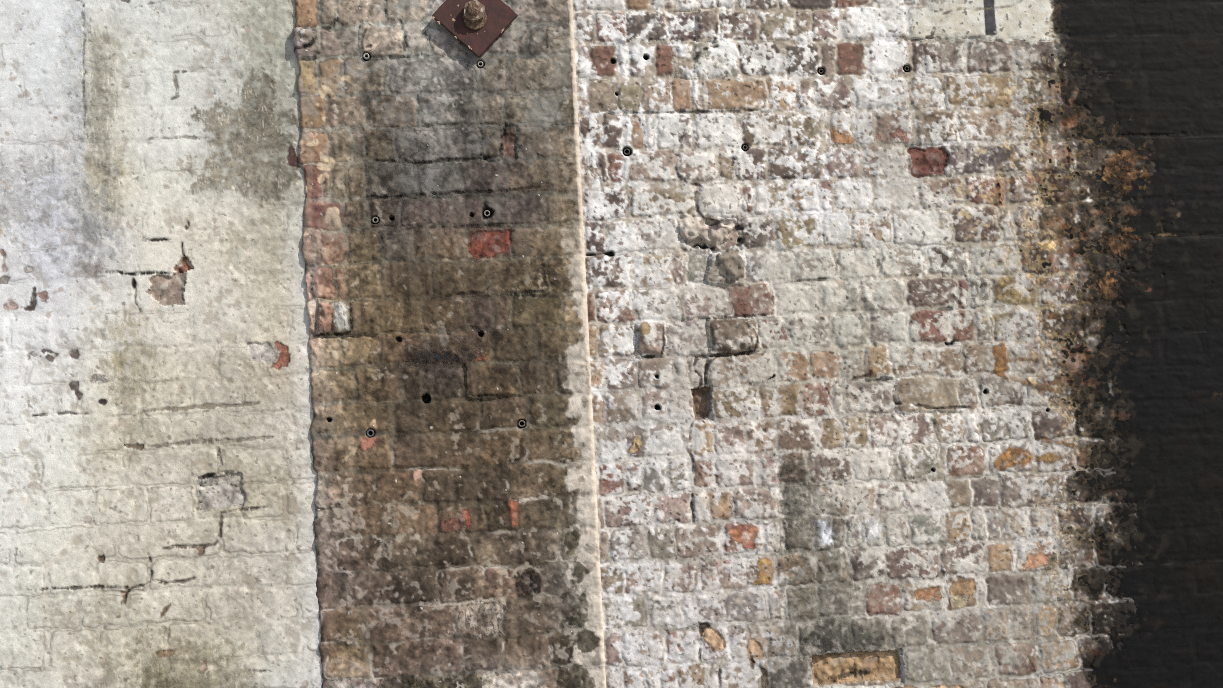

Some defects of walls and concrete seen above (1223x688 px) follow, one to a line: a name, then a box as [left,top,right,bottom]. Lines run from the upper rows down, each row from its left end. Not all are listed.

damp [188,75,300,199]
spalling [106,243,193,306]
peeling [247,341,290,369]
crack [40,507,259,617]
damp [325,530,600,688]